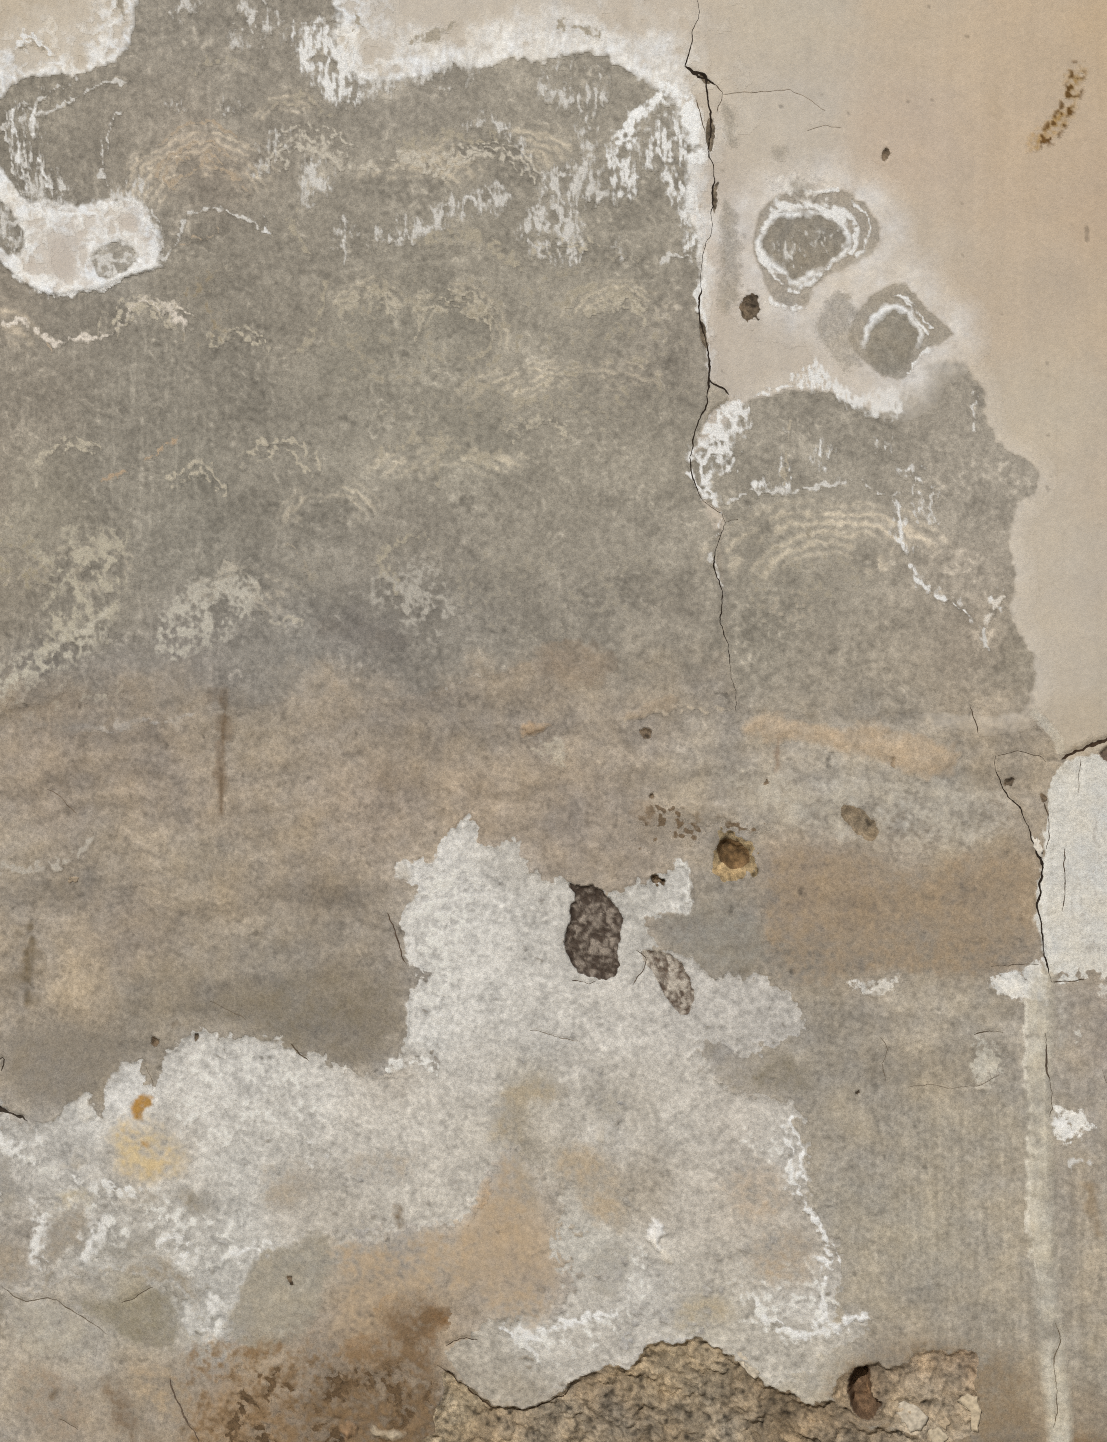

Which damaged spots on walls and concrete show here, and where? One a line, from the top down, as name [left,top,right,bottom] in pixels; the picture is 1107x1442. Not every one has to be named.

damp [0,0,1058,818]
crack [685,1,841,710]
peeling [0,812,983,1442]
spalling [840,803,880,842]
crack [970,707,1107,982]
peeling [1034,751,1107,986]